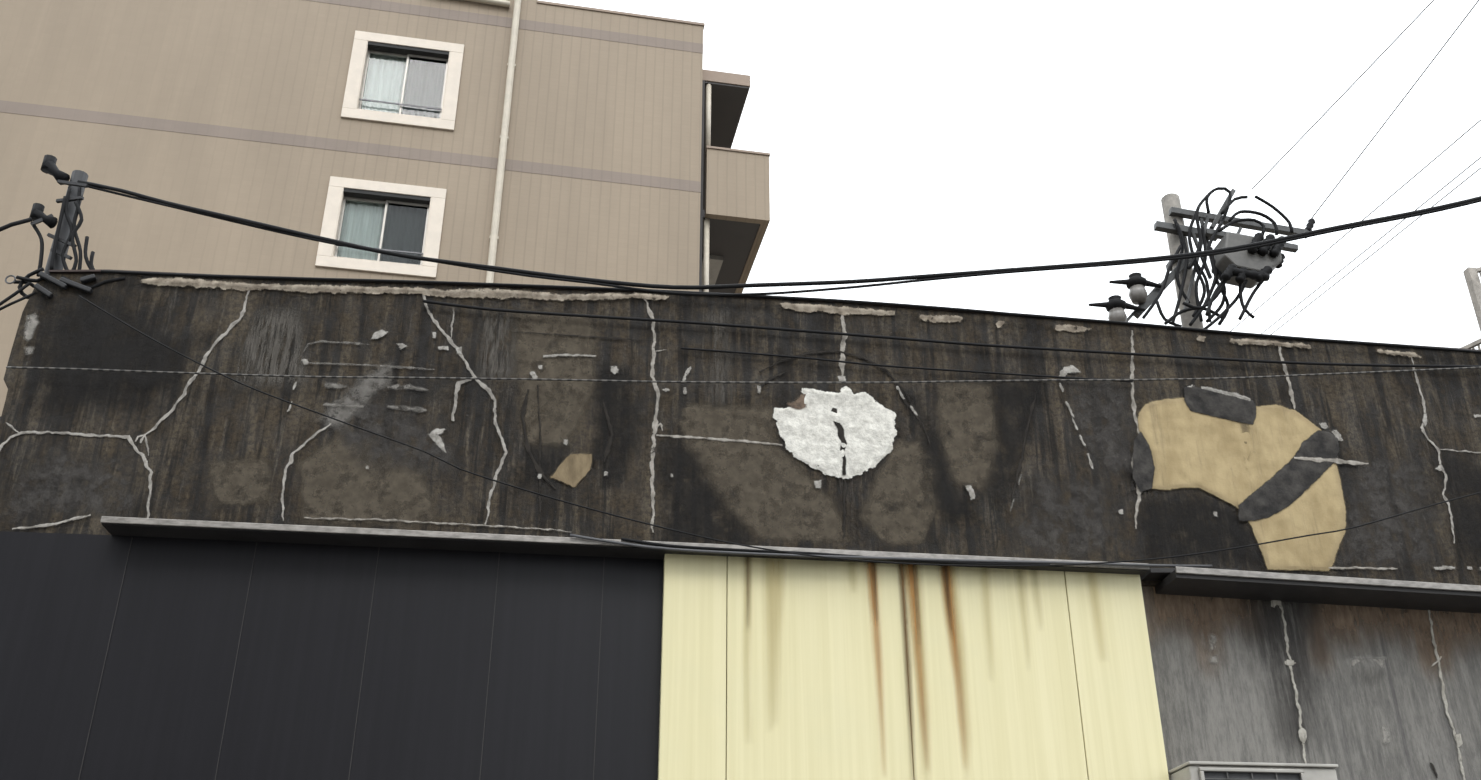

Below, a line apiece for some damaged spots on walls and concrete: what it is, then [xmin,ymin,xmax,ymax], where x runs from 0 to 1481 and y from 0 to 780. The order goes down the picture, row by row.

damp [25,297,178,402]
crack [0,290,250,518]
crack [422,294,508,525]
damp [595,369,635,480]
crack [643,298,782,533]
peeling [831,408,847,475]
peeling [1187,384,1251,401]
crack [1411,357,1481,543]
damp [1146,498,1259,560]
rust [868,562,879,661]
rust [899,564,919,721]
rust [942,566,957,669]